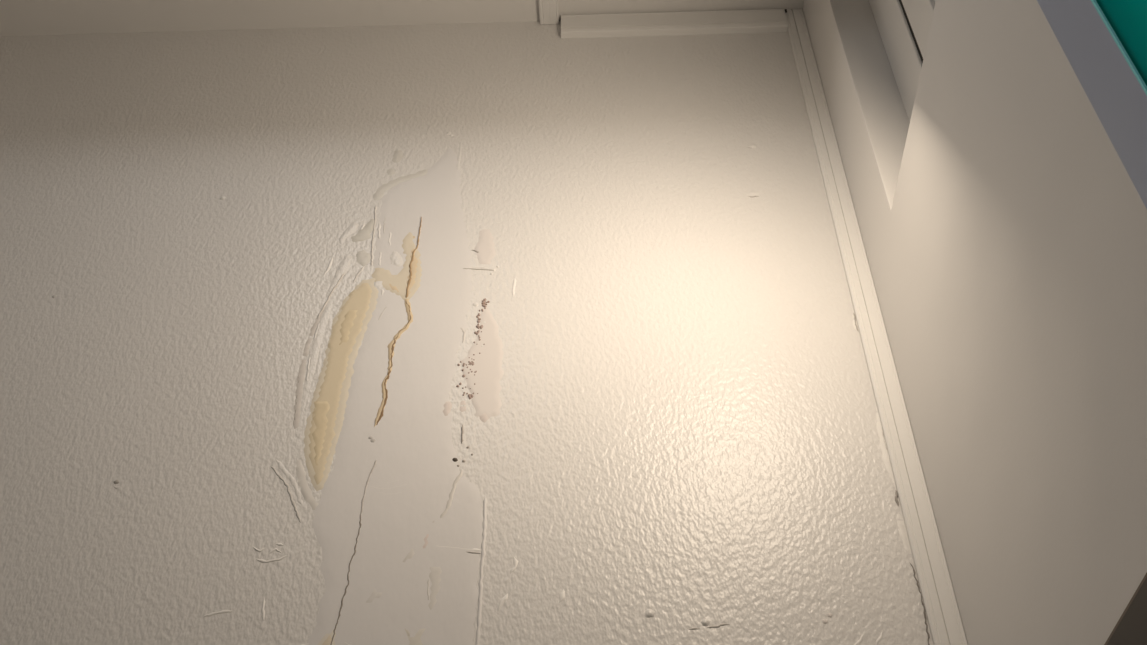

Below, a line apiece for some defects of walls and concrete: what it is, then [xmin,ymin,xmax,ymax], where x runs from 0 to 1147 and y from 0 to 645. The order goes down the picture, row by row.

leakage [293,219,422,510]
crack [377,216,422,424]
crack [330,460,377,645]